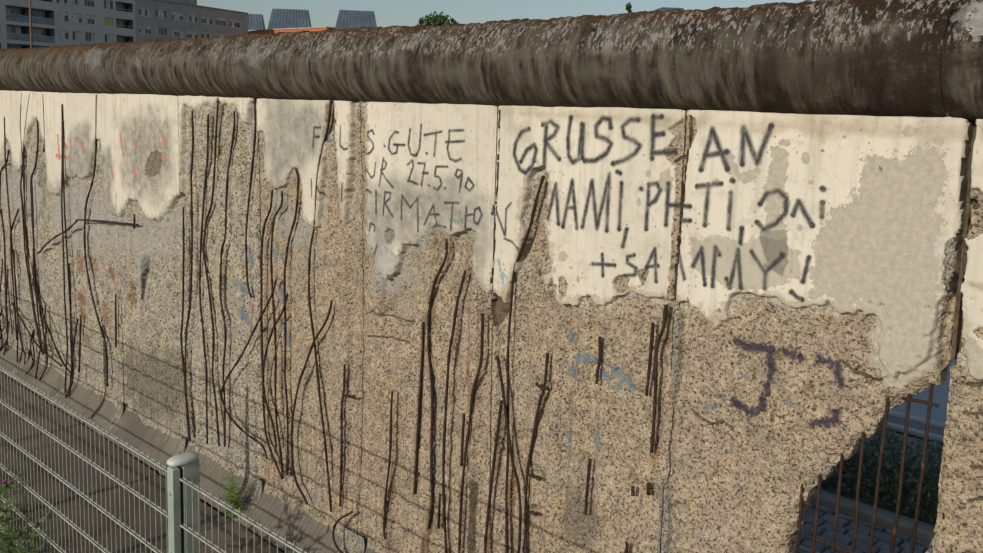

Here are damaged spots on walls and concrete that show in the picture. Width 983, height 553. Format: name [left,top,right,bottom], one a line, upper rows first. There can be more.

damp [407,50,427,104]
spalling [220,100,957,553]
crack [947,121,983,387]
spalling [965,188,983,240]
spalling [933,327,983,553]
crack [967,495,983,503]